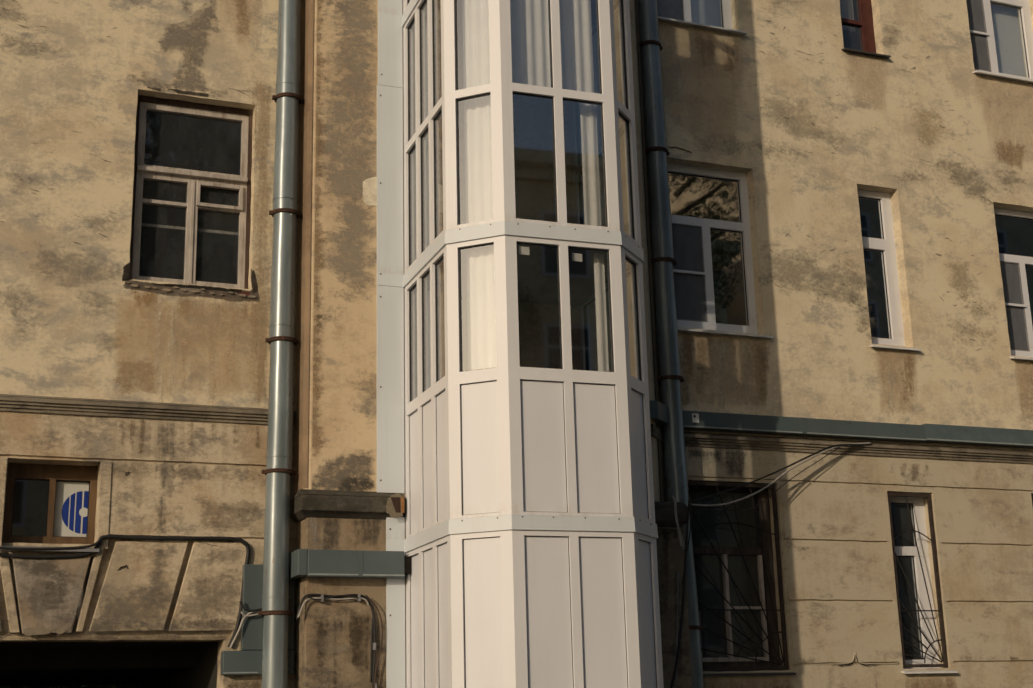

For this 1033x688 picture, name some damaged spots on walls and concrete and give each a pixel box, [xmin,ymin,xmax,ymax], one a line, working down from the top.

water stain [314,0,377,303]
water stain [312,315,373,491]